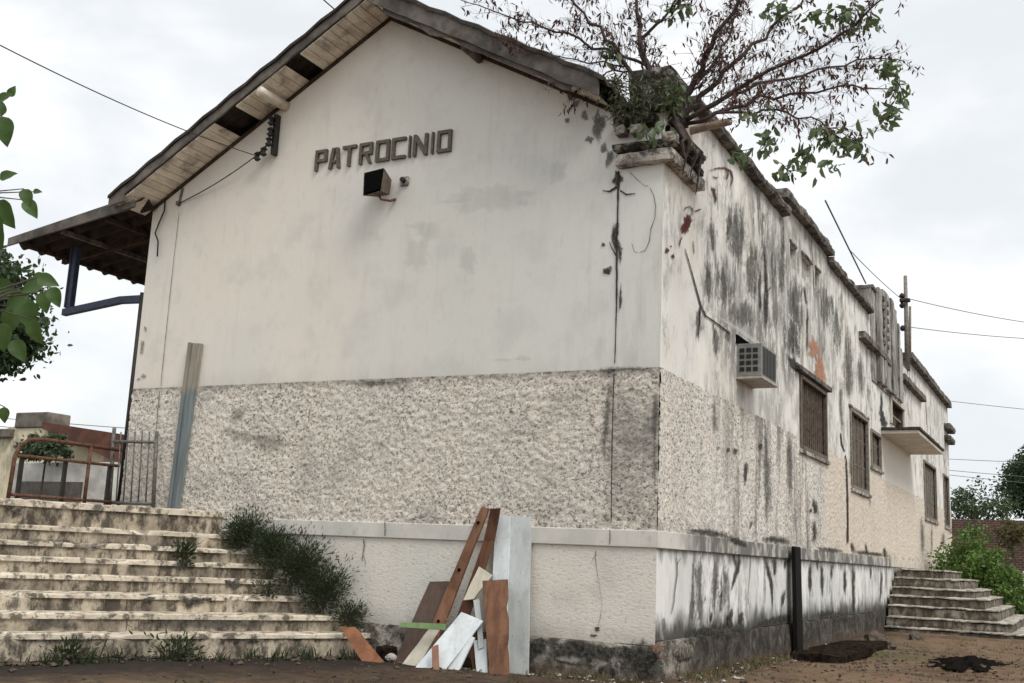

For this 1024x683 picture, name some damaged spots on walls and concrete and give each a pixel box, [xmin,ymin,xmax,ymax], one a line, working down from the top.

leakage [696,207,809,374]
crack [592,171,656,625]
spalling [809,336,825,382]
leakage [821,289,865,425]
leakage [759,425,771,512]
leakage [31,619,78,629]
leakage [15,539,106,549]
leakage [151,620,262,629]
leakage [681,528,791,642]
leakage [808,500,888,622]